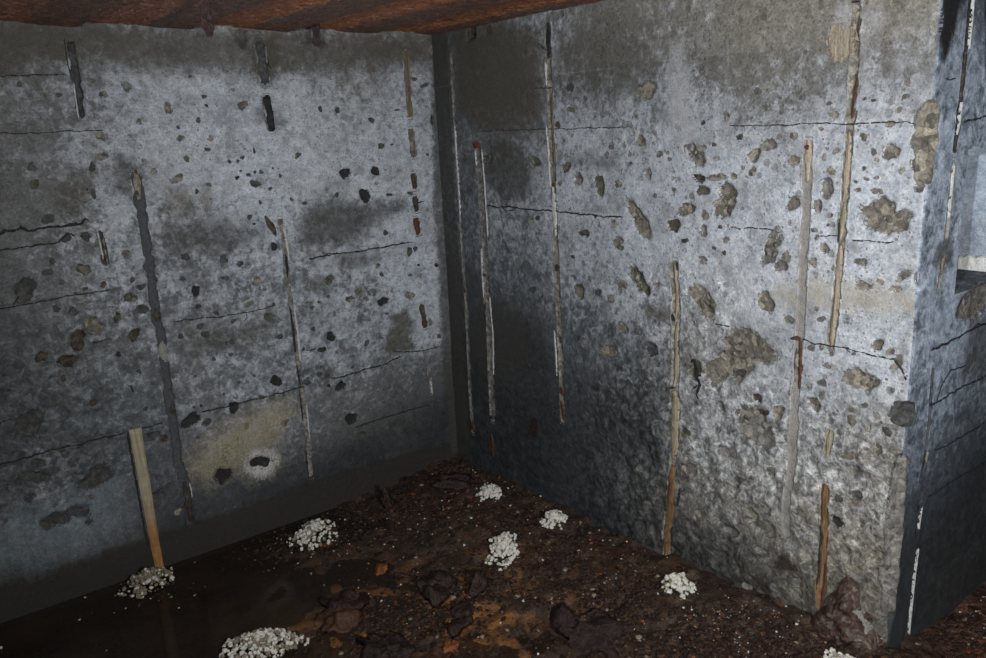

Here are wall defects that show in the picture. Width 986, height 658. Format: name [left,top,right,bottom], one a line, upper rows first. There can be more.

damp [939,0,964,62]
crack [730,120,914,128]
spalling [863,78,911,127]
spalling [854,99,940,235]
crack [0,218,89,251]
crack [486,205,622,218]
damp [0,22,469,623]
spalling [689,283,716,320]
spalling [688,326,778,387]
crack [931,323,986,351]
crack [930,365,986,406]
spalling [717,393,784,453]